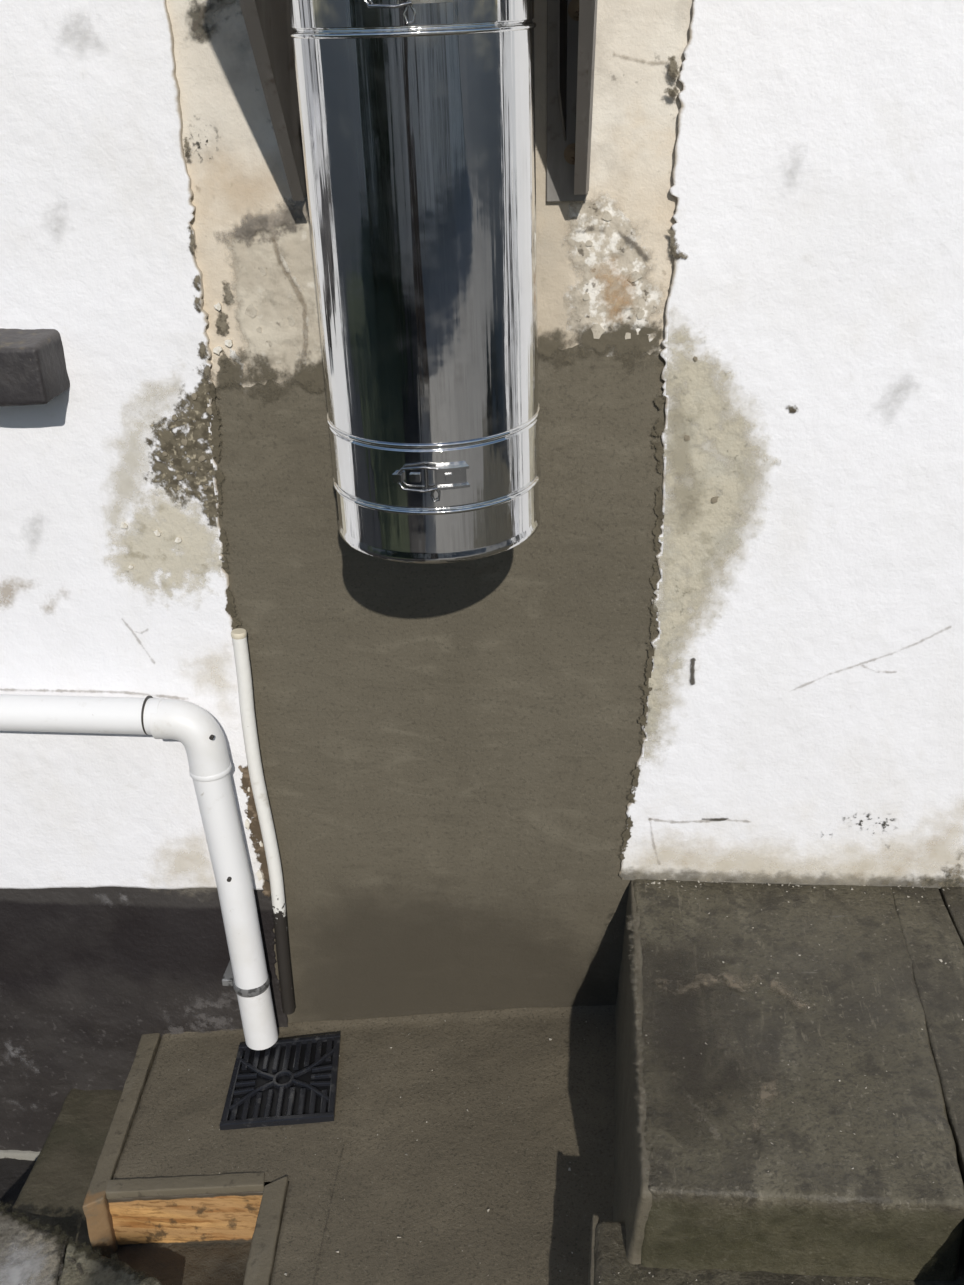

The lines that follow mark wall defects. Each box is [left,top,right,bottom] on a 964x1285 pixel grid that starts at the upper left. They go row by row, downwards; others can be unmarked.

flaking render [109,0,323,597]
flaking render [532,0,761,735]